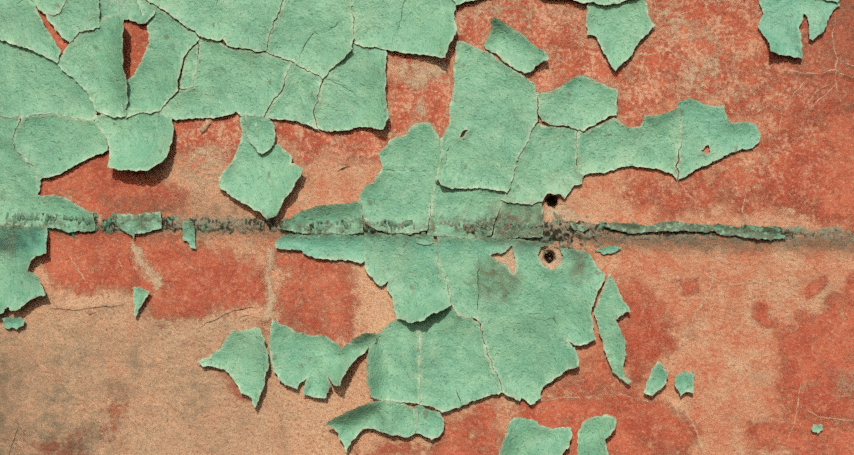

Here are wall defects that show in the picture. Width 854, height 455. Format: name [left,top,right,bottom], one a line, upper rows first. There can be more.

peeling [36,6,70,51]
peeling [122,19,149,80]
crack [147,0,355,118]
peeling [622,147,781,221]
flaking render [491,246,516,274]
flaking render [538,242,564,270]
flaking render [543,202,589,232]
peeling [604,221,786,241]
peeling [2,317,25,329]
peeling [198,327,269,408]
peeling [326,273,702,455]
peeling [748,272,854,455]